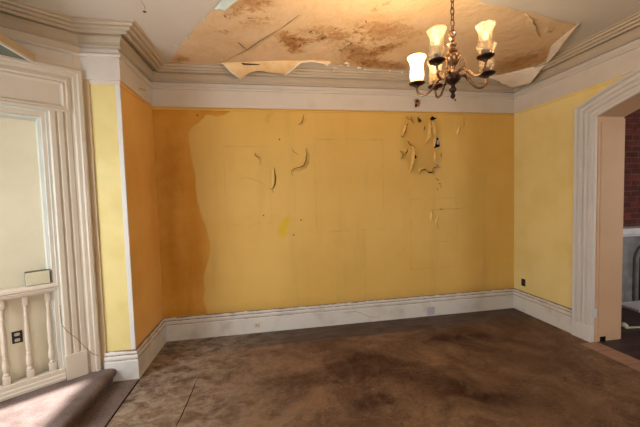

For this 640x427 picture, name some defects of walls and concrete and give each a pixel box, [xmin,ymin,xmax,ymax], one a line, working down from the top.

peeling [400,116,442,190]